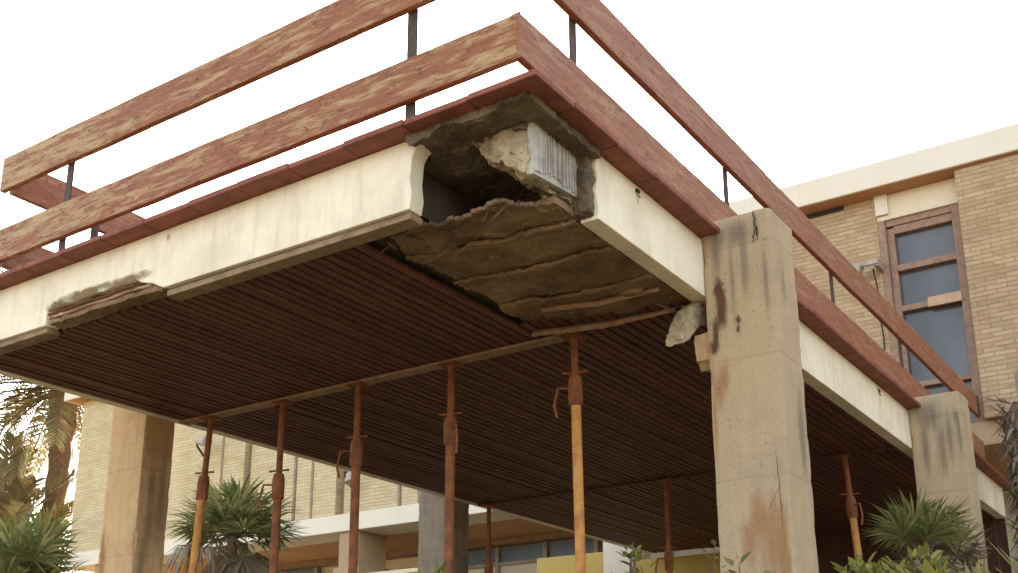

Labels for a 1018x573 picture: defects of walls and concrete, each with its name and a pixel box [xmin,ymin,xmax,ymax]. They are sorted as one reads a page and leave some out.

spalling [372,91,692,337]
spalling [48,283,170,330]
corrosion [710,279,741,354]